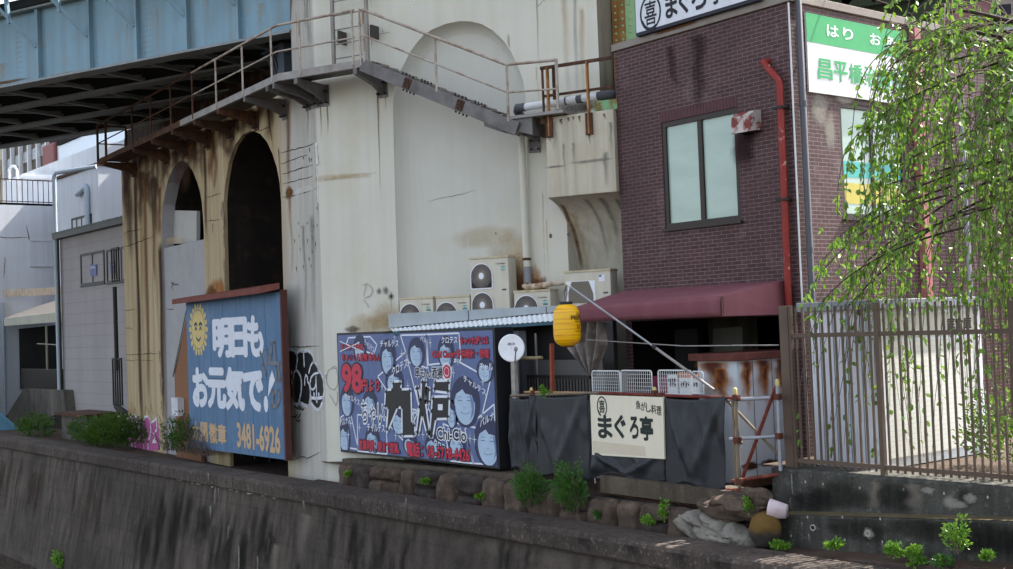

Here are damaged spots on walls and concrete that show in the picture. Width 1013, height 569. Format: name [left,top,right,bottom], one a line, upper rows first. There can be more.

corrosion [189,119,239,222]
corrosion [123,172,164,411]
corrosion [701,362,728,396]
corrosion [742,359,782,396]